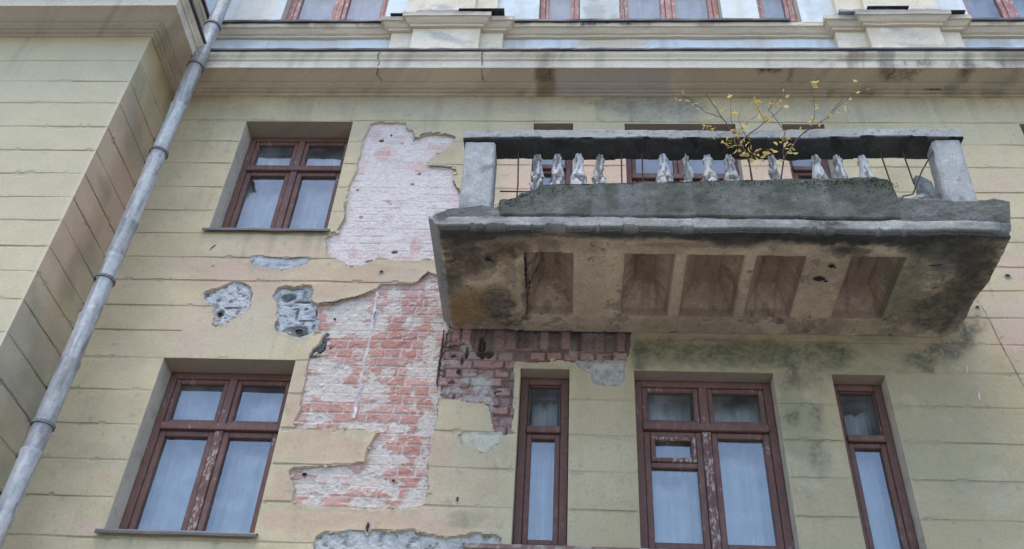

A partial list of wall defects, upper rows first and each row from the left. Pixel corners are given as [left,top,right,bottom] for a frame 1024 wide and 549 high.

spalling [204,282,252,327]
peeling [250,256,311,270]
crack [524,252,538,314]
flaking render [274,124,631,549]